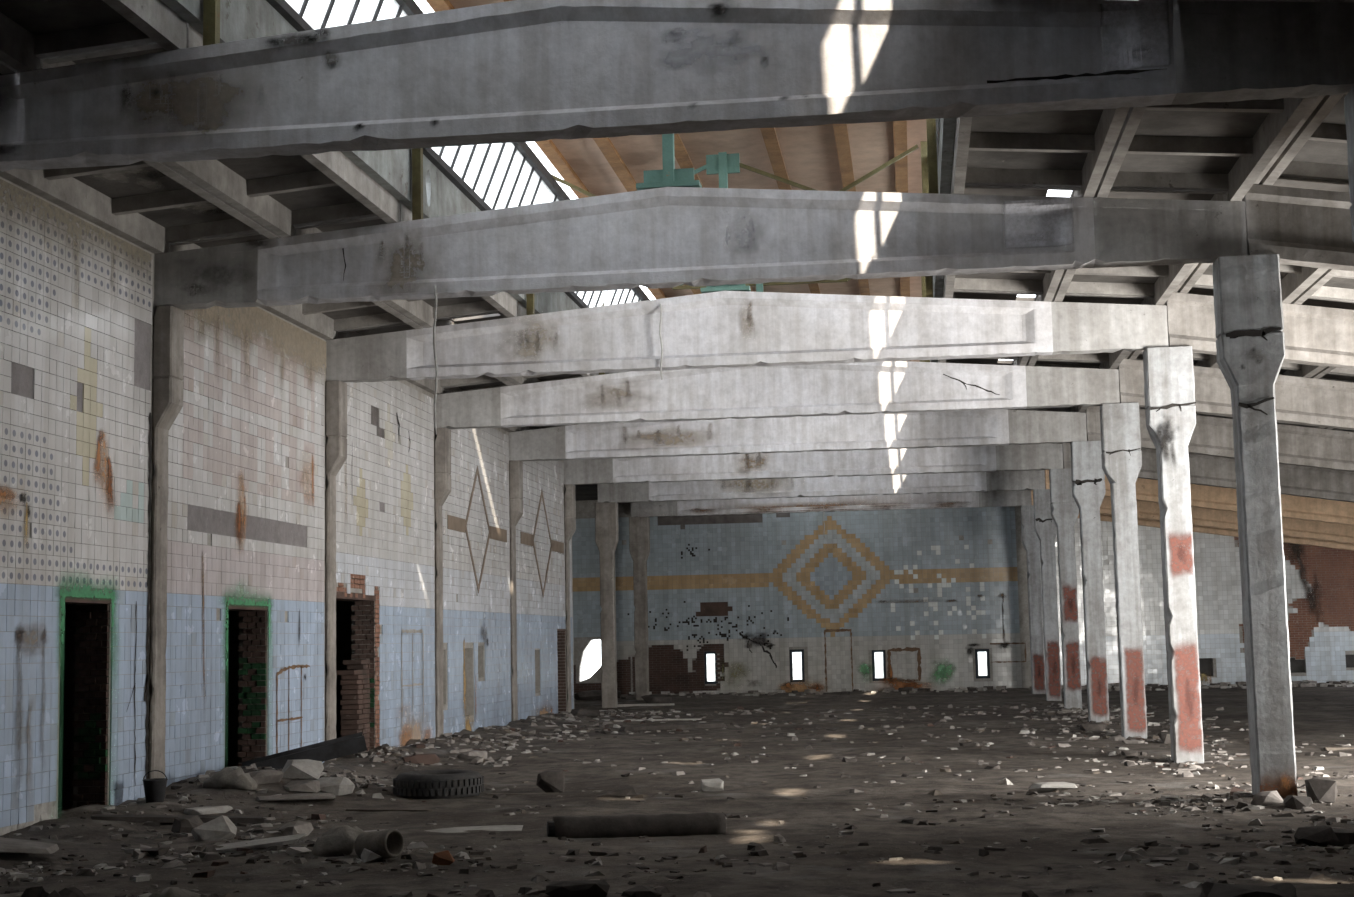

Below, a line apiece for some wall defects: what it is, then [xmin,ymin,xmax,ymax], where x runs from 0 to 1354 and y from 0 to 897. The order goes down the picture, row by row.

crack [987,69,1164,83]
crack [1226,327,1281,340]
crack [1150,402,1196,412]
crack [1238,397,1274,415]
corrosion [95,432,113,502]
flaking render [1283,542,1354,660]
flaking render [617,601,789,695]
flaking render [574,665,601,694]